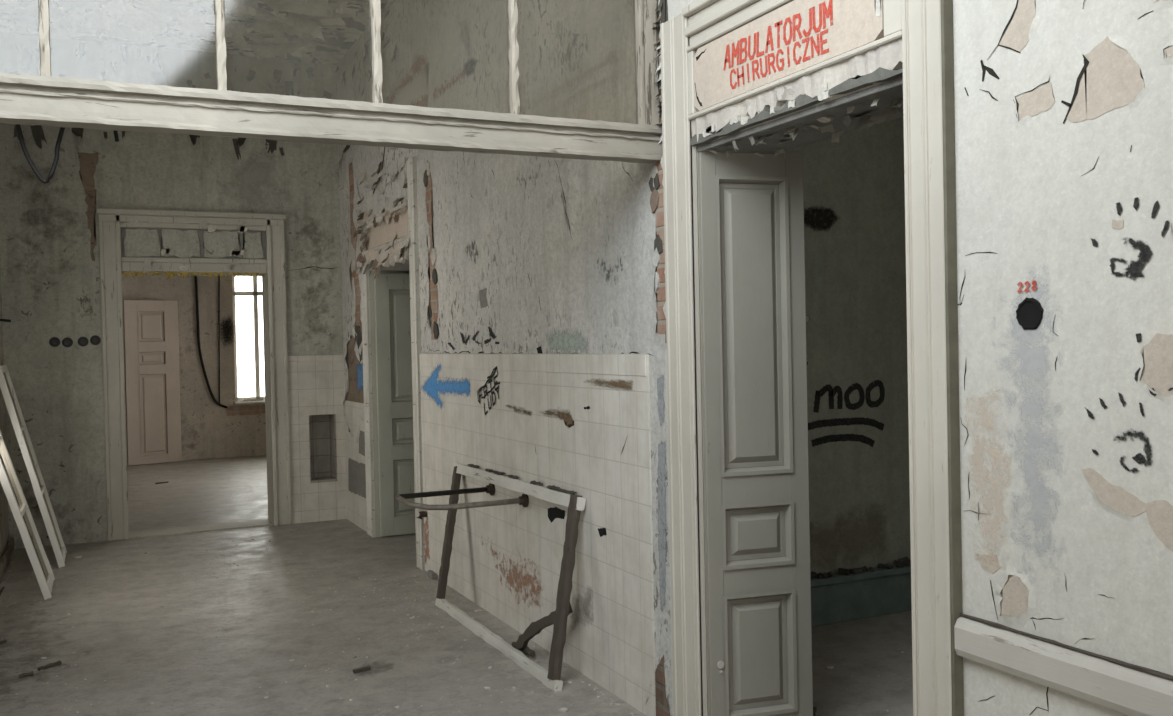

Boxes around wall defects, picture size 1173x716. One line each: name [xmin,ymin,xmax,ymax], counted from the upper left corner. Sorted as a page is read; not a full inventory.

flaking render [227,0,434,108]
peeling [987,0,1040,60]
peeling [979,29,1150,129]
peeling [1159,40,1173,65]
peeling [13,125,48,149]
peeling [232,138,246,160]
peeling [263,139,284,157]
flaking render [71,128,108,269]
flaking render [423,160,439,343]
peeling [1135,333,1173,403]
peeling [1082,468,1173,552]
corrosion [490,546,541,605]